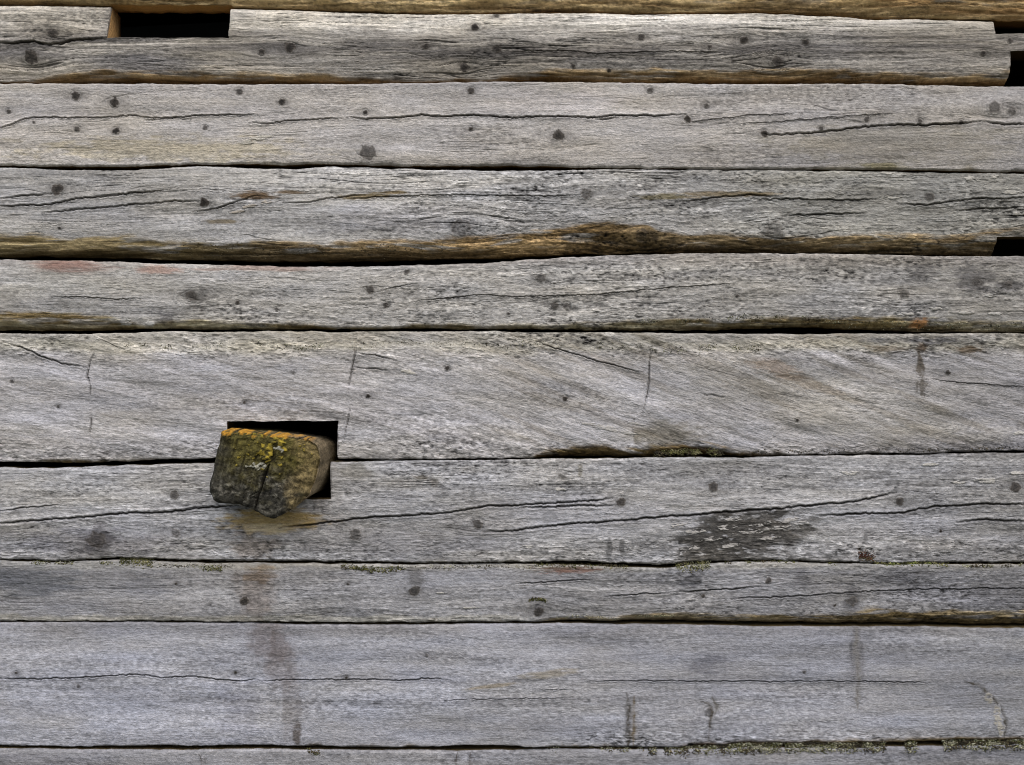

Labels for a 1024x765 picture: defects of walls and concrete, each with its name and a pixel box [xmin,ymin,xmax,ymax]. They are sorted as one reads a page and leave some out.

crack [0,112,1024,136]
crack [0,188,579,214]
crack [678,193,1024,217]
crack [277,492,1024,533]
water stain [209,504,345,746]